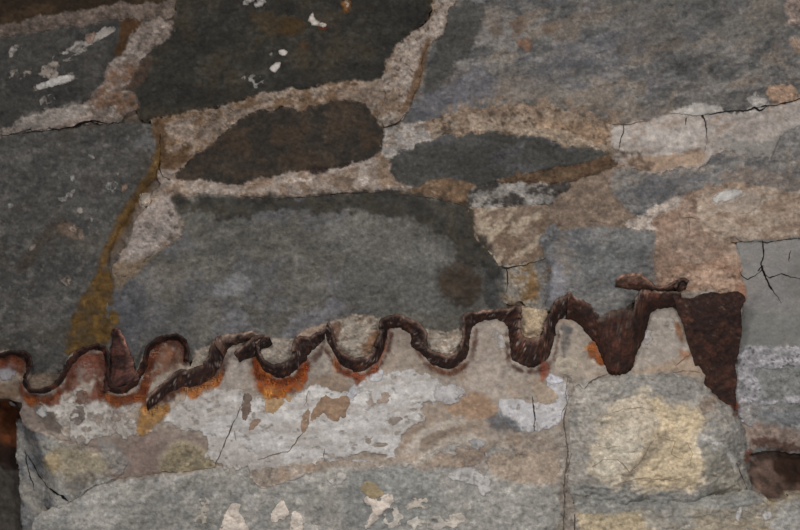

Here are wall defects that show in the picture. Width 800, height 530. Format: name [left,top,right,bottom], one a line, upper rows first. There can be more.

crack [672,98,800,152]
crack [736,238,800,302]
rust [0,339,225,435]
rust [252,330,393,399]
rust [506,334,549,379]
rust [585,341,604,364]